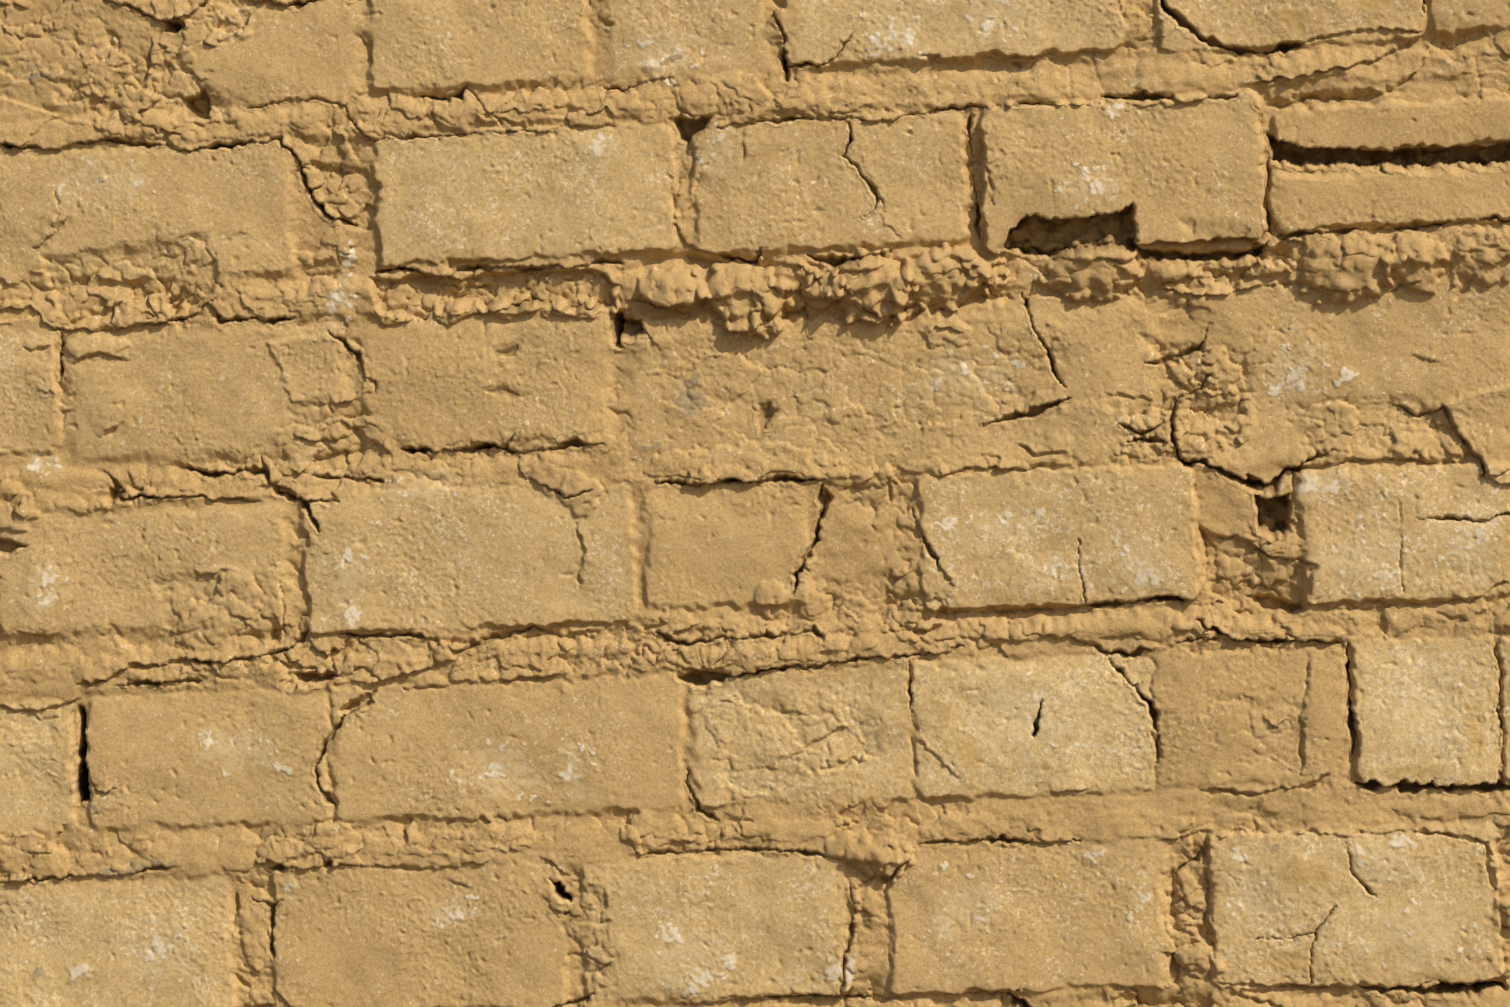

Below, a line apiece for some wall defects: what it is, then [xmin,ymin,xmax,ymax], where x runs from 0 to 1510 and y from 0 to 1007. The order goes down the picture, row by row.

crack [1156,0,1305,58]
crack [838,117,888,221]
crack [652,483,830,669]
peeling [907,399,1510,632]
crack [180,628,375,808]
spalling [1030,699,1044,738]
peeling [1347,620,1510,788]